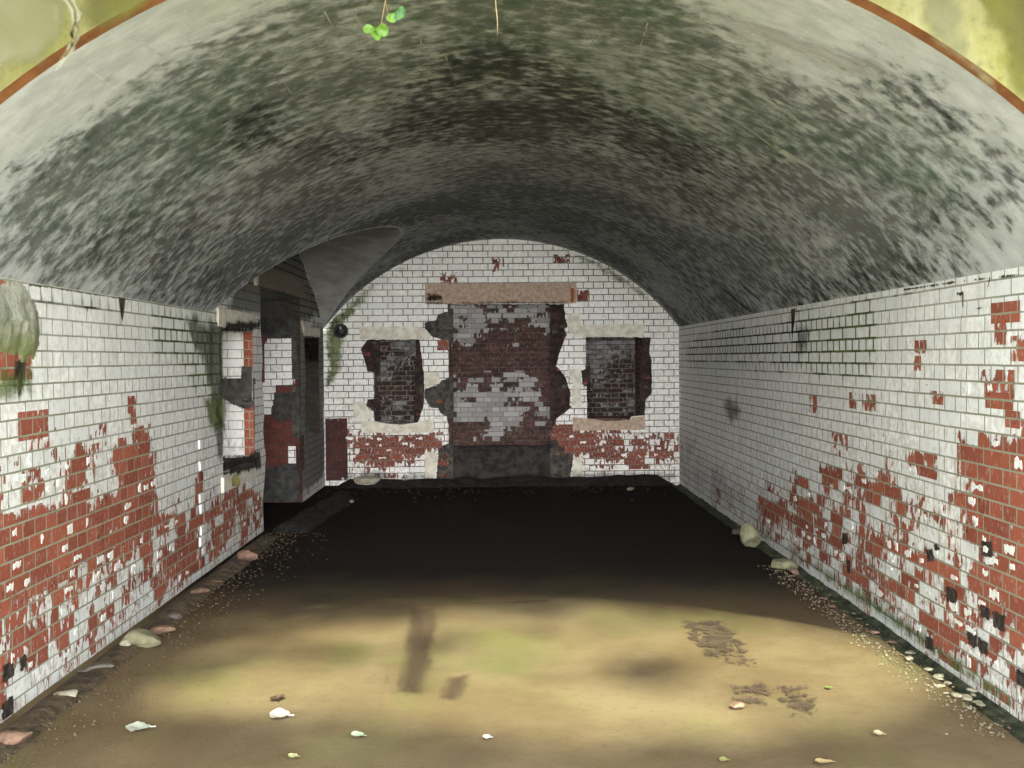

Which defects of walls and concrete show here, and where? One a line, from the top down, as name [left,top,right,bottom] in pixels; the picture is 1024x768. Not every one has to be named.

water stain [0,0,1024,496]
spalling [325,340,449,481]
peeling [437,304,550,350]
peeling [452,371,679,469]
spalling [587,348,635,416]
spalling [0,396,263,710]
spalling [756,300,1024,714]